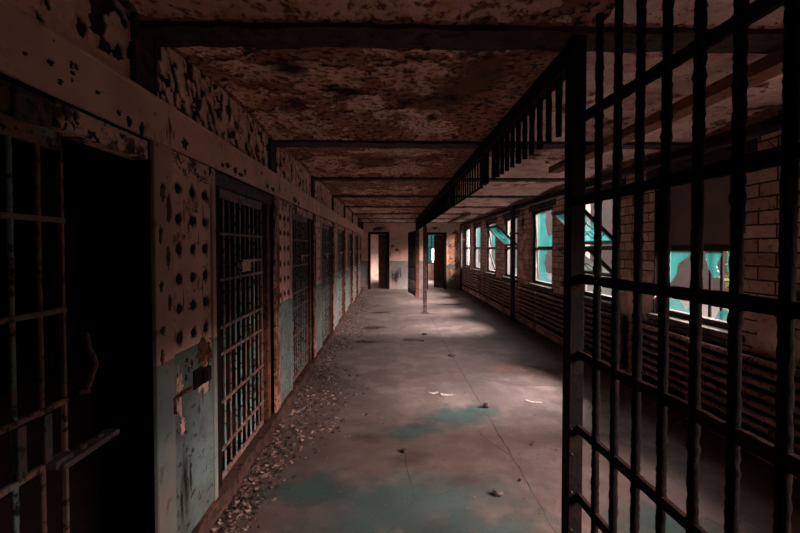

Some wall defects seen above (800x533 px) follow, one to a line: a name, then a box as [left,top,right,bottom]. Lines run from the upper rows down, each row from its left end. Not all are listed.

peeling [8,0,572,79]
peeling [157,46,521,226]
peeling [176,336,213,435]
crack [413,313,556,532]